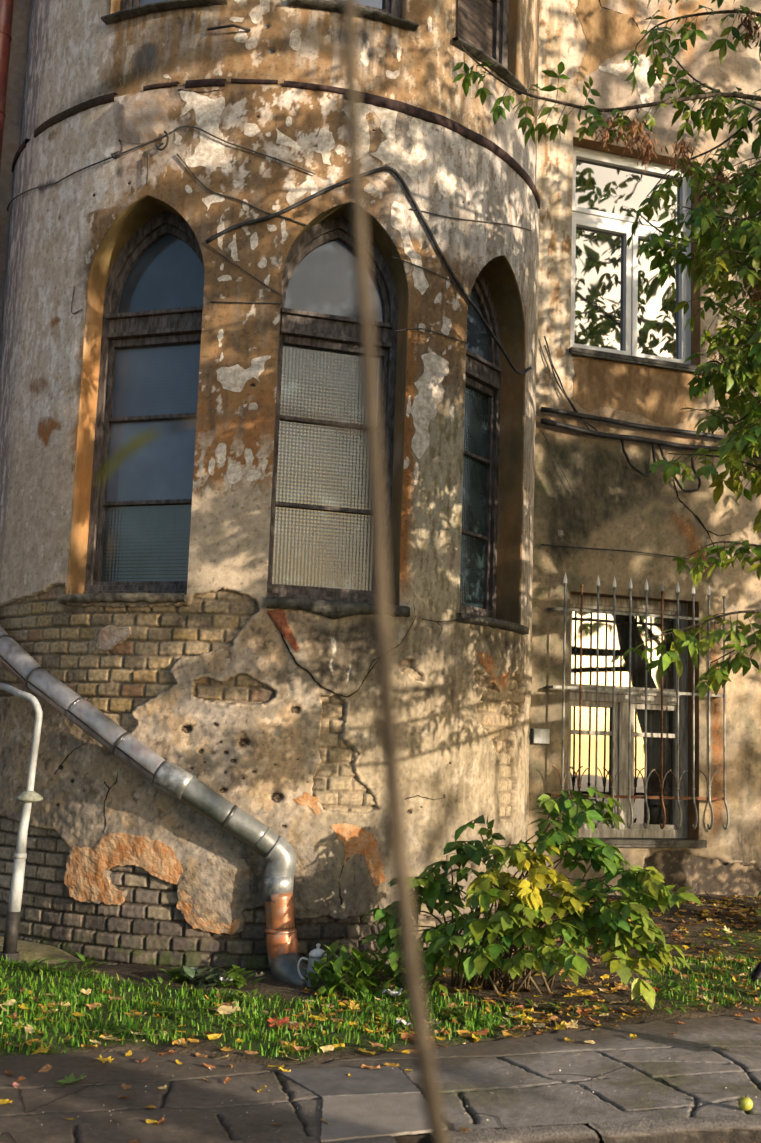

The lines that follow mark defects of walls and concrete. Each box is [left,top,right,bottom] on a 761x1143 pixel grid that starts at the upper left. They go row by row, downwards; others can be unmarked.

spalling [0,583,299,733]